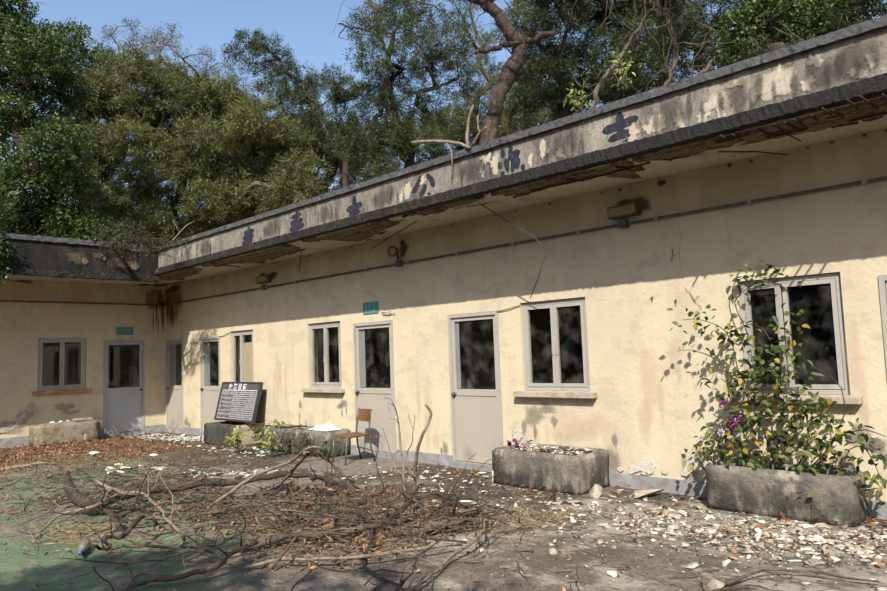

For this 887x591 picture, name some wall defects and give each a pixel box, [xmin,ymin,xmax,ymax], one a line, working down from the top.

peeling [756,54,823,101]
peeling [847,53,877,78]
spalling [159,93,887,280]
water stain [137,279,196,332]
water stain [522,405,556,436]